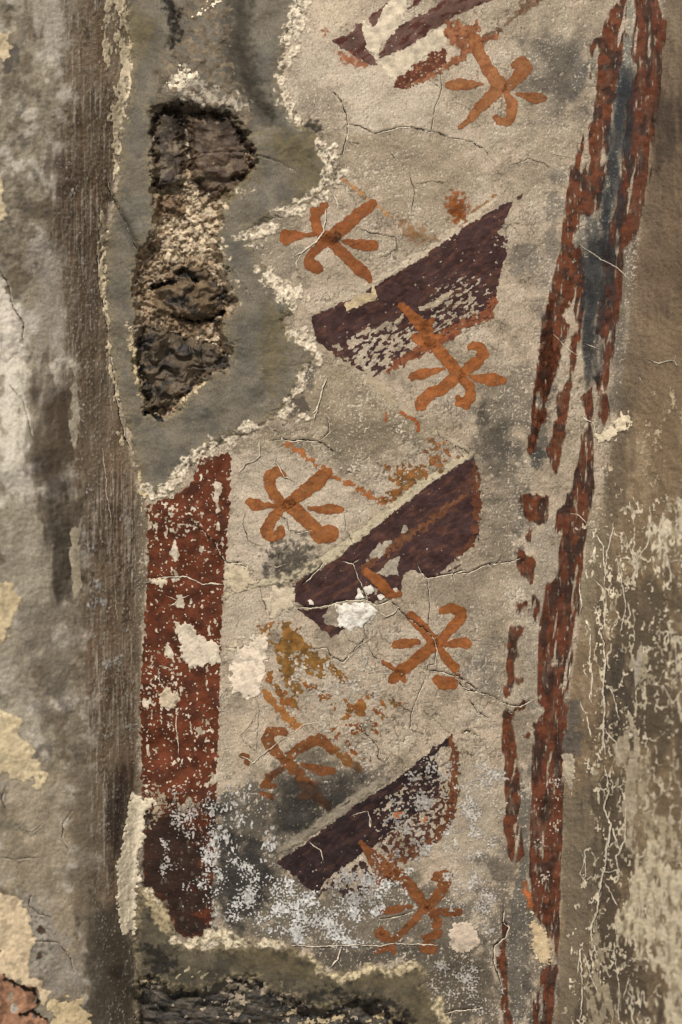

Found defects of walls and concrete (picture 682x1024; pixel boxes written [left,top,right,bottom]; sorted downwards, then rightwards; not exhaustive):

crack [331,72,571,211]
spalling [124,103,256,422]
crack [146,515,534,736]
crack [238,698,328,764]
crack [358,723,393,763]
efflorescence [158,747,509,958]
flaking render [133,974,407,1024]